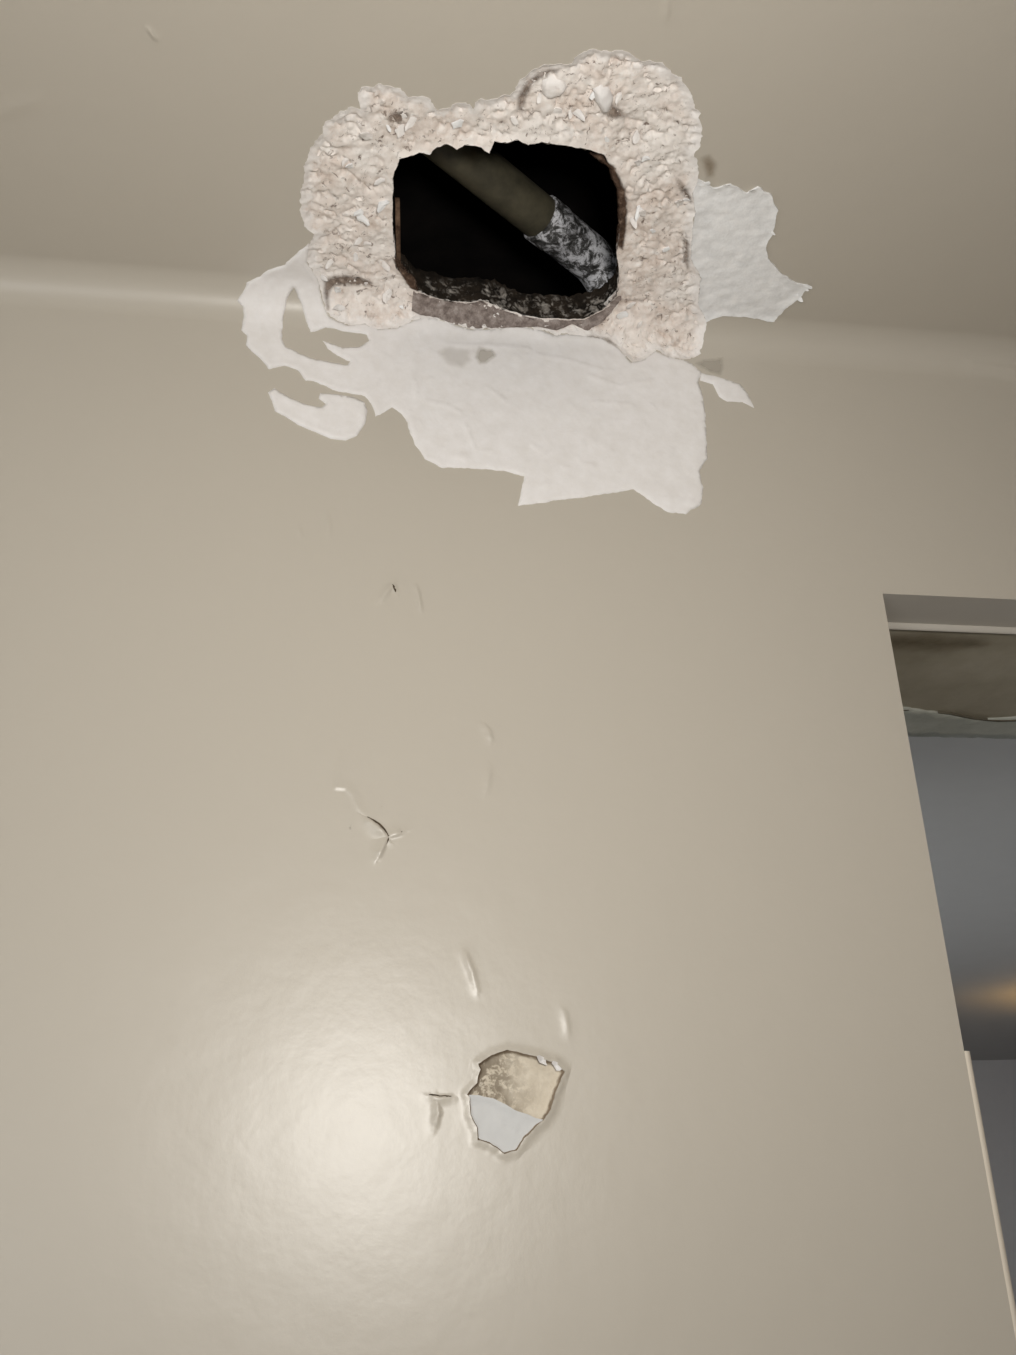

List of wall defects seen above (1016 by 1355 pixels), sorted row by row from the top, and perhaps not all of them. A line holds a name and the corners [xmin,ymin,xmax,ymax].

flaking render [237,49,812,514]
flaking render [455,1037,571,1166]